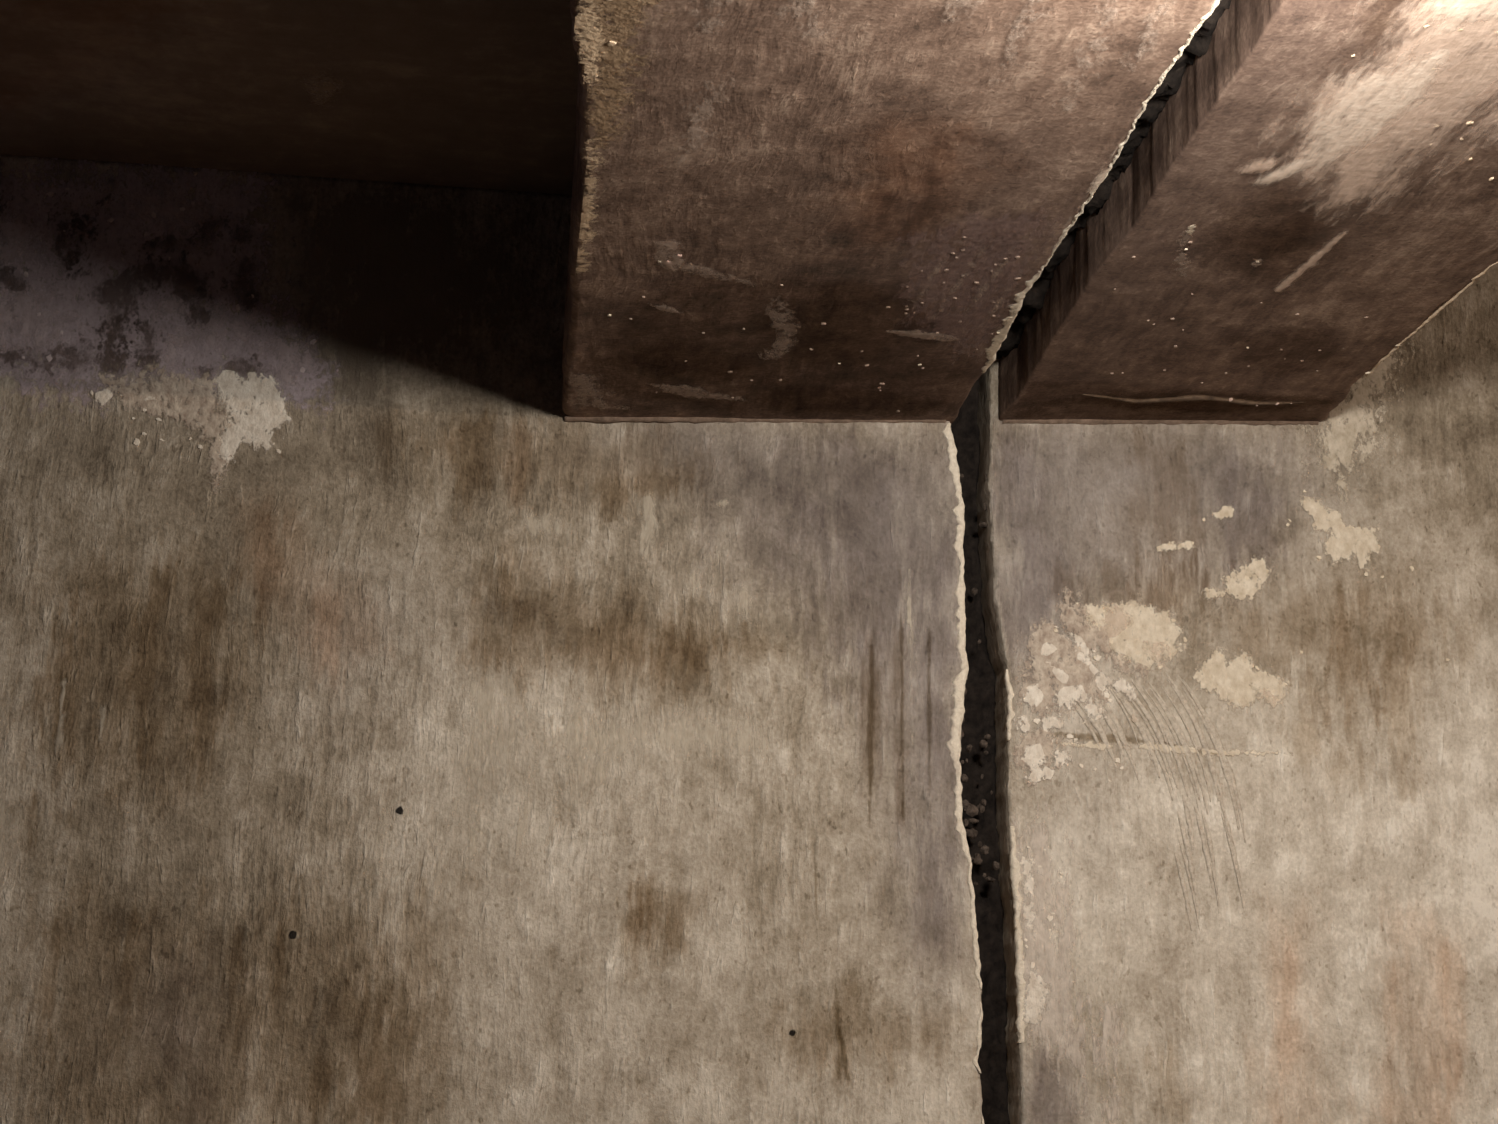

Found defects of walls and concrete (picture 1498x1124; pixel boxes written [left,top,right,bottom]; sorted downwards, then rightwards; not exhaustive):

crack [942,0,1231,1124]